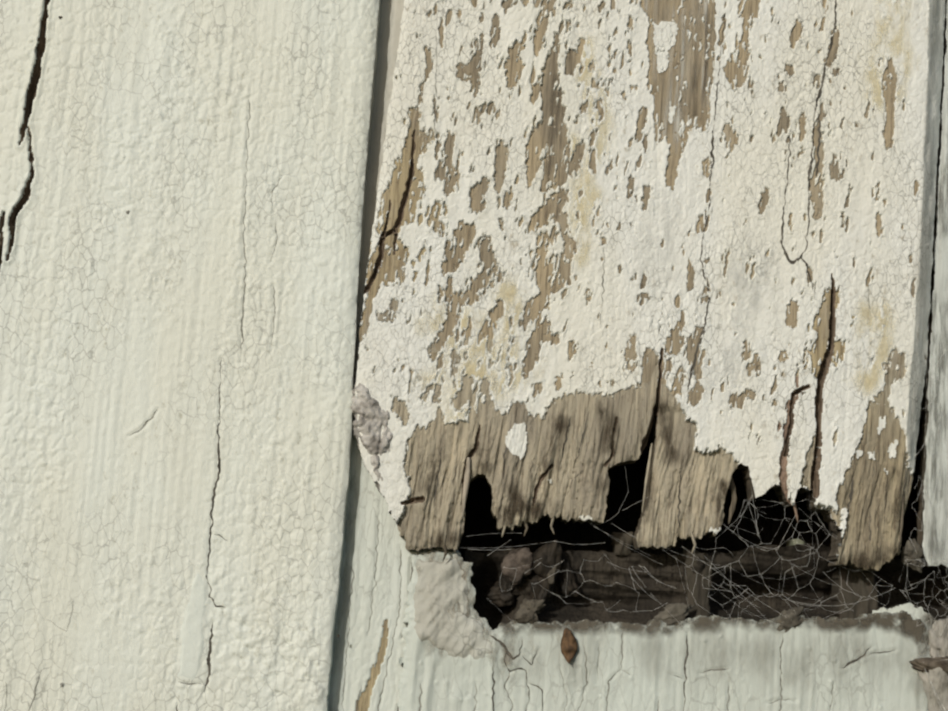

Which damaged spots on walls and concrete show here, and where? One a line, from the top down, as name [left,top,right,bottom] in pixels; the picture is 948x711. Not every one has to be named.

peeling [855,59,905,150]
peeling [872,183,886,237]
peeling [350,0,852,551]
peeling [816,350,913,571]
crack [341,517,423,711]
peeling [356,619,389,711]
crack [474,630,630,711]
crack [671,634,730,711]
crack [772,634,791,711]